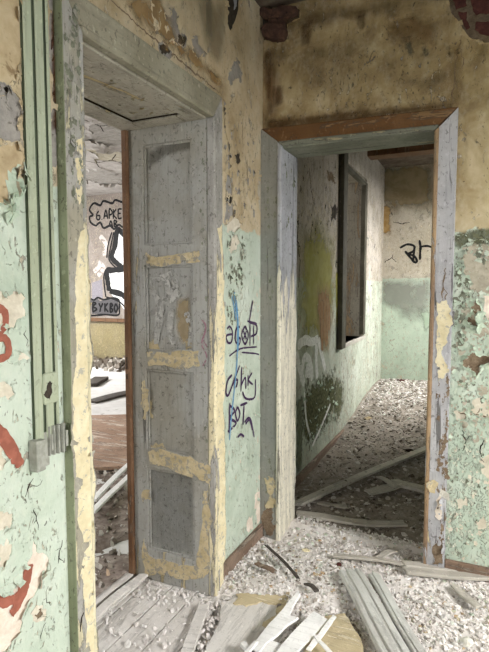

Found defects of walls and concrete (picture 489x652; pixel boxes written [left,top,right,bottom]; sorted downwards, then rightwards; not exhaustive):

crack [111,0,159,44]
spalling [260,5,301,45]
spalling [445,0,489,46]
crack [171,53,222,95]
peeling [0,0,32,225]
water stain [268,113,360,128]
peeling [0,286,28,334]
peeling [140,99,277,581]
peeling [426,234,489,566]
peeling [0,446,11,473]
peeling [70,228,99,652]
peeling [0,538,51,652]